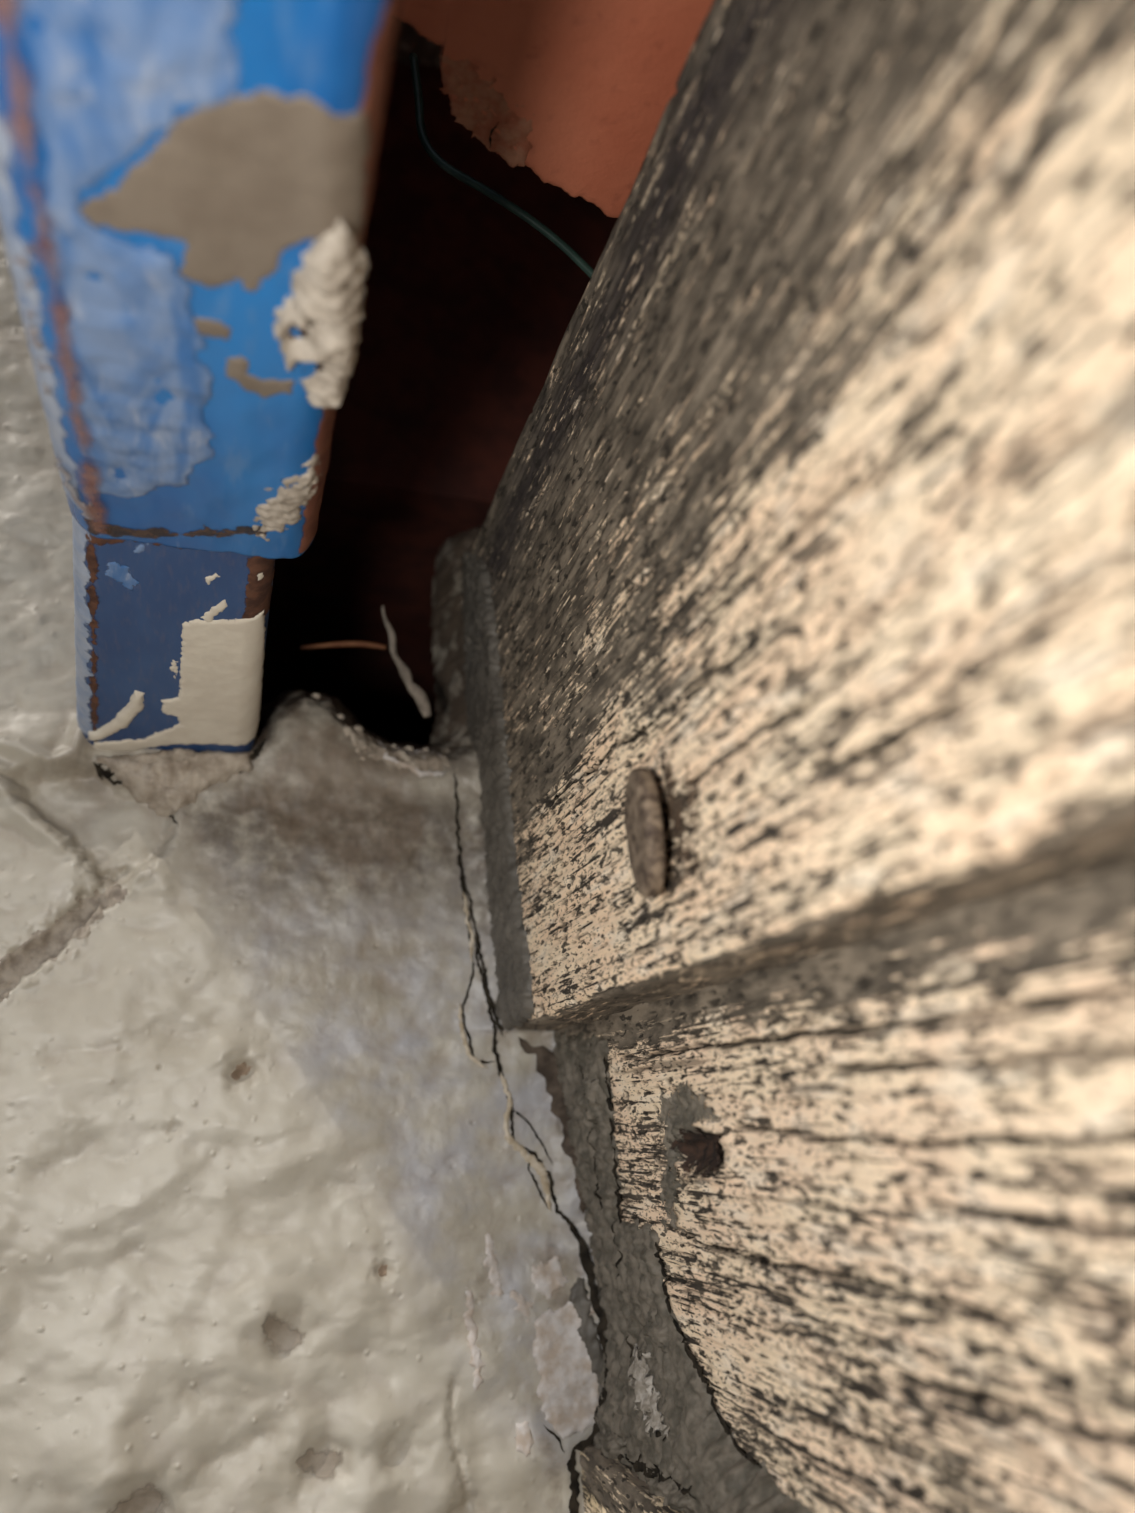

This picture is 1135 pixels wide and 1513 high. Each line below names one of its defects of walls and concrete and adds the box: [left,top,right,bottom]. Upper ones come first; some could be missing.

rust [9,67,31,149]
spalling [439,55,535,168]
rust [51,304,88,444]
peeling [252,452,323,541]
crack [454,774,696,1513]